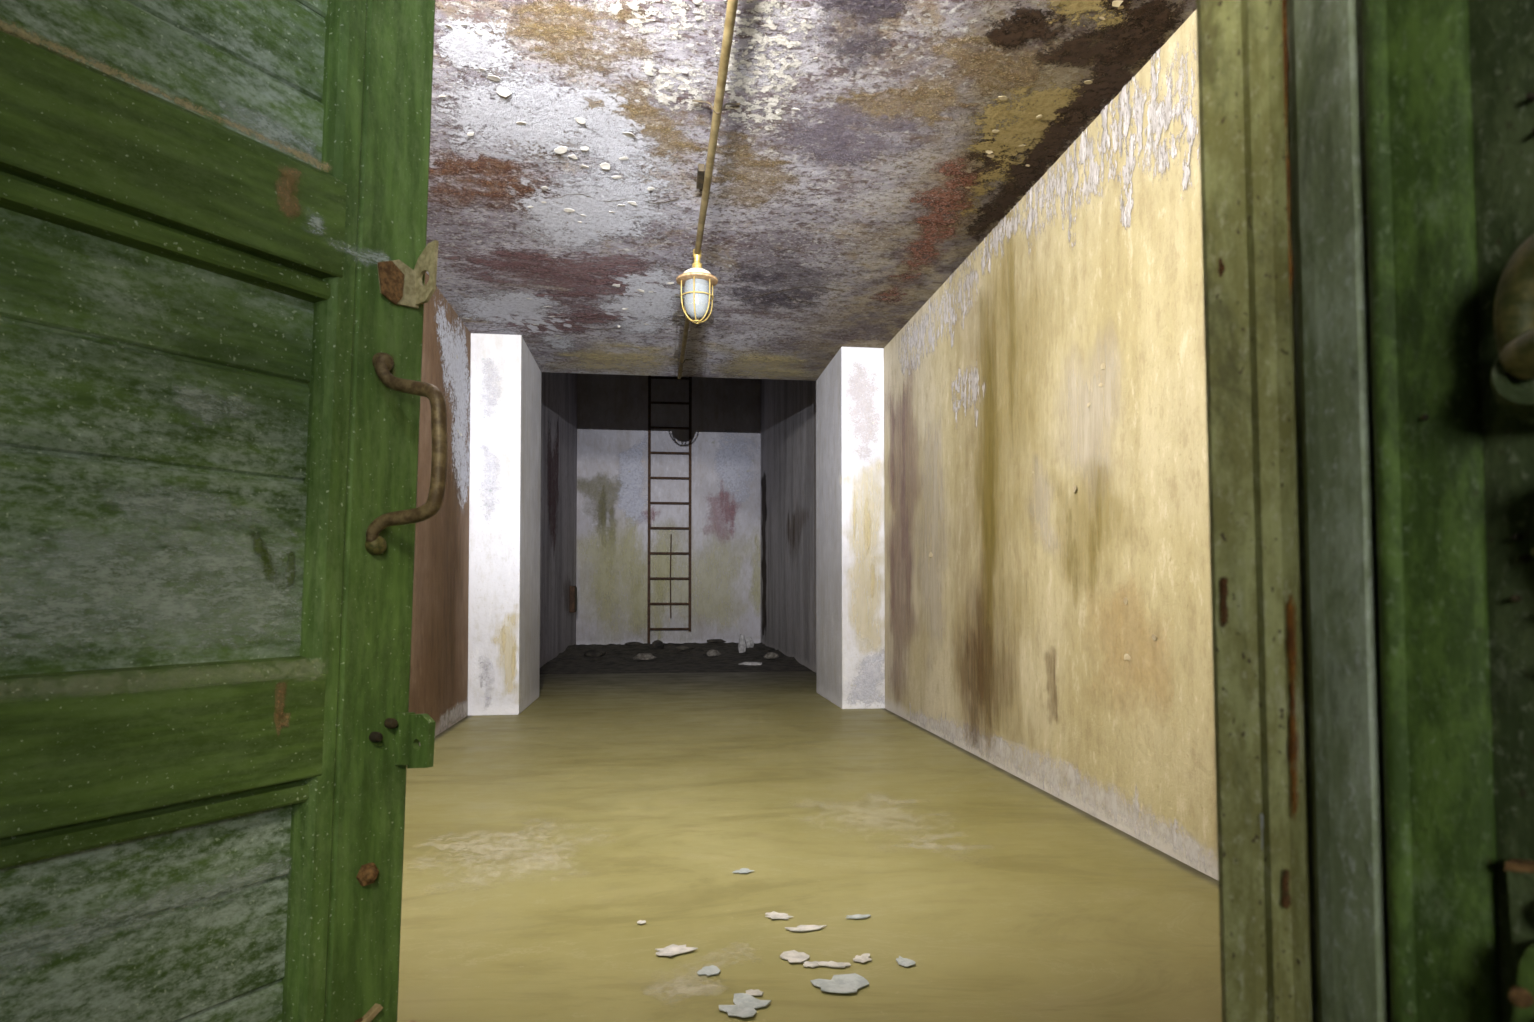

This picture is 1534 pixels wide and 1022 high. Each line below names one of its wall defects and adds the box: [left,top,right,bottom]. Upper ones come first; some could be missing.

corrosion [428,147,561,217]
water stain [898,0,1200,375]
corrosion [427,241,674,338]
water stain [952,365,985,427]
water stain [578,476,730,637]
water stain [910,713,1203,860]